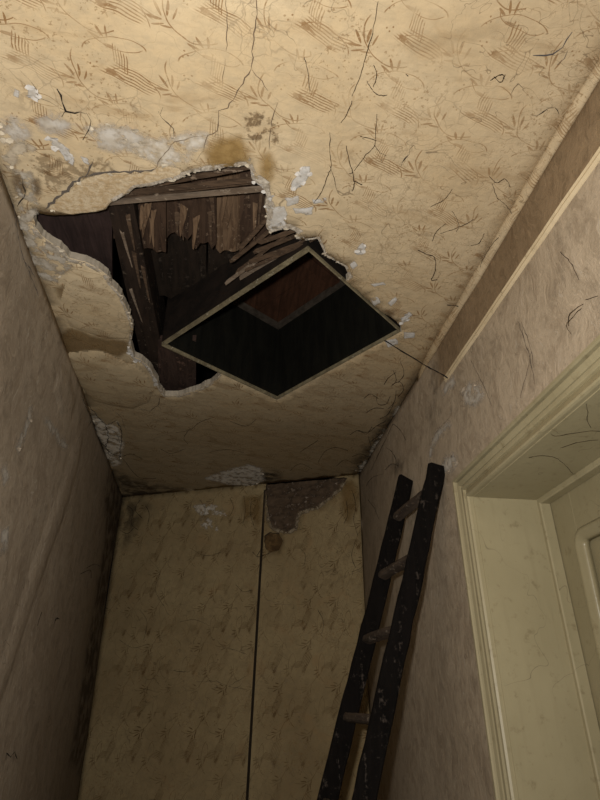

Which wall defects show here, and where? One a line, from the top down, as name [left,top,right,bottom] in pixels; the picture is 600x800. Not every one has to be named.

crack [31,82,91,139]
peeling [38,117,89,165]
crack [46,0,266,209]
water stain [208,139,246,166]
peeling [0,117,72,282]
peeling [49,123,366,281]
flaking render [110,286,221,397]
peeling [386,312,415,347]
peeling [93,416,124,466]
flaking render [206,465,346,553]